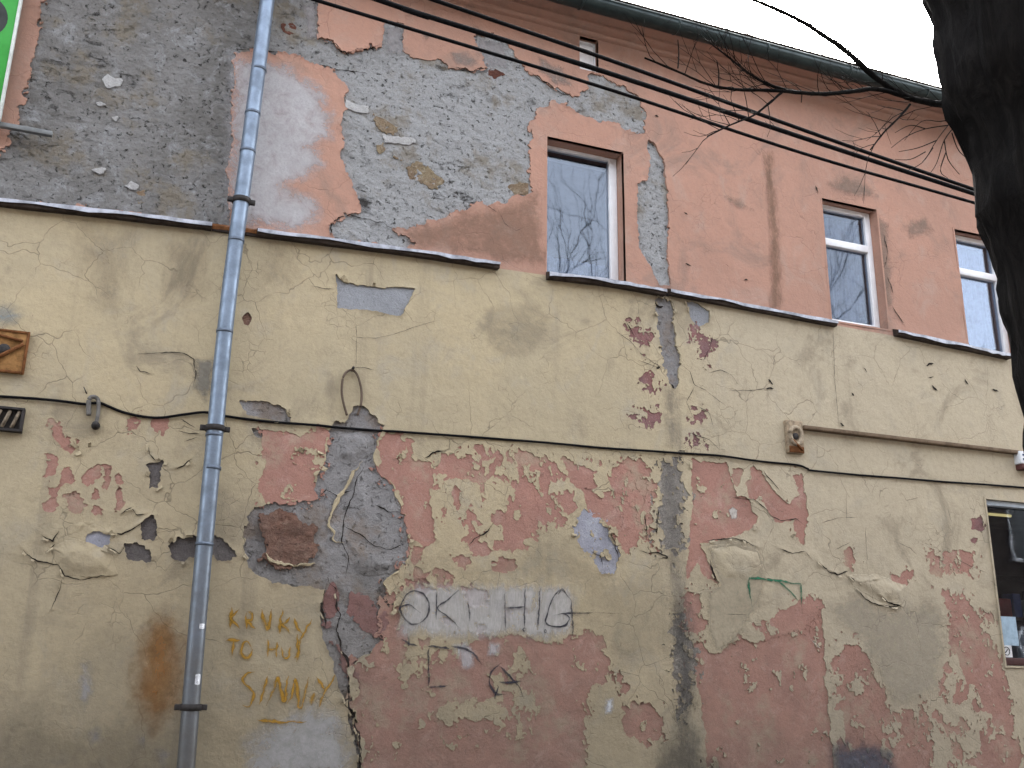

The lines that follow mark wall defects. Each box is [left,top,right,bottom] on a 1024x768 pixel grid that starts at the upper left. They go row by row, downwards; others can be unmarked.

spalling [0,0,260,226]
spalling [268,0,719,429]
crack [137,352,196,381]
peeling [42,418,126,516]
peeling [145,458,169,491]
peeling [85,515,196,565]
crack [319,467,400,768]
spalling [212,400,1024,768]
crack [594,509,668,564]
crack [704,538,756,579]
crack [740,472,902,609]
rust [141,624,178,714]